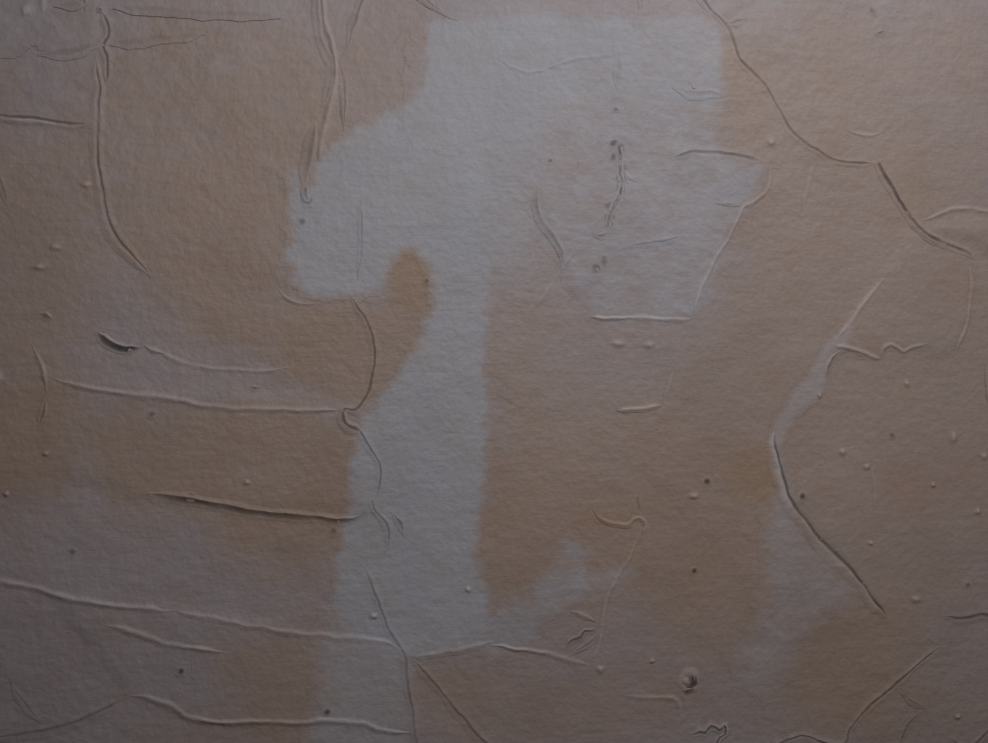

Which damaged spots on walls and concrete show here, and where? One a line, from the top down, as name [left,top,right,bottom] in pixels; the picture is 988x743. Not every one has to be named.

crack [0,110,88,132]
crack [589,138,636,278]
crack [667,145,767,165]
crack [697,0,975,260]
crack [142,201,406,554]
crack [939,607,988,625]